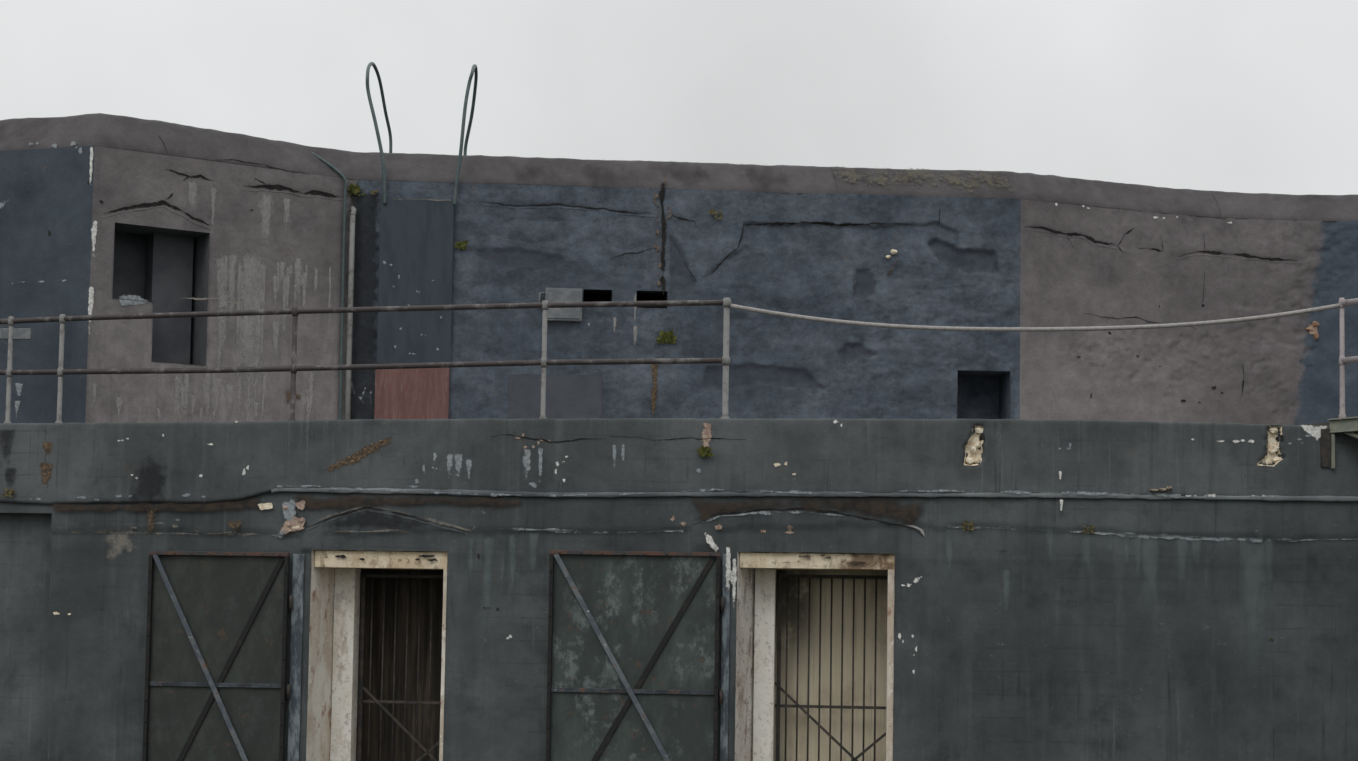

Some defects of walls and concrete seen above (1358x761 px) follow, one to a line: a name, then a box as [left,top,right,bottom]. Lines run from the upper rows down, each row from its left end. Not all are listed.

crack [103,135,343,231]
water stain [260,194,290,240]
crack [480,178,940,295]
crack [1024,226,1298,329]
water stain [157,255,331,422]
spalling [964,426,985,466]
spalling [1219,425,1327,466]
peeling [153,453,521,538]
peeling [52,527,136,558]